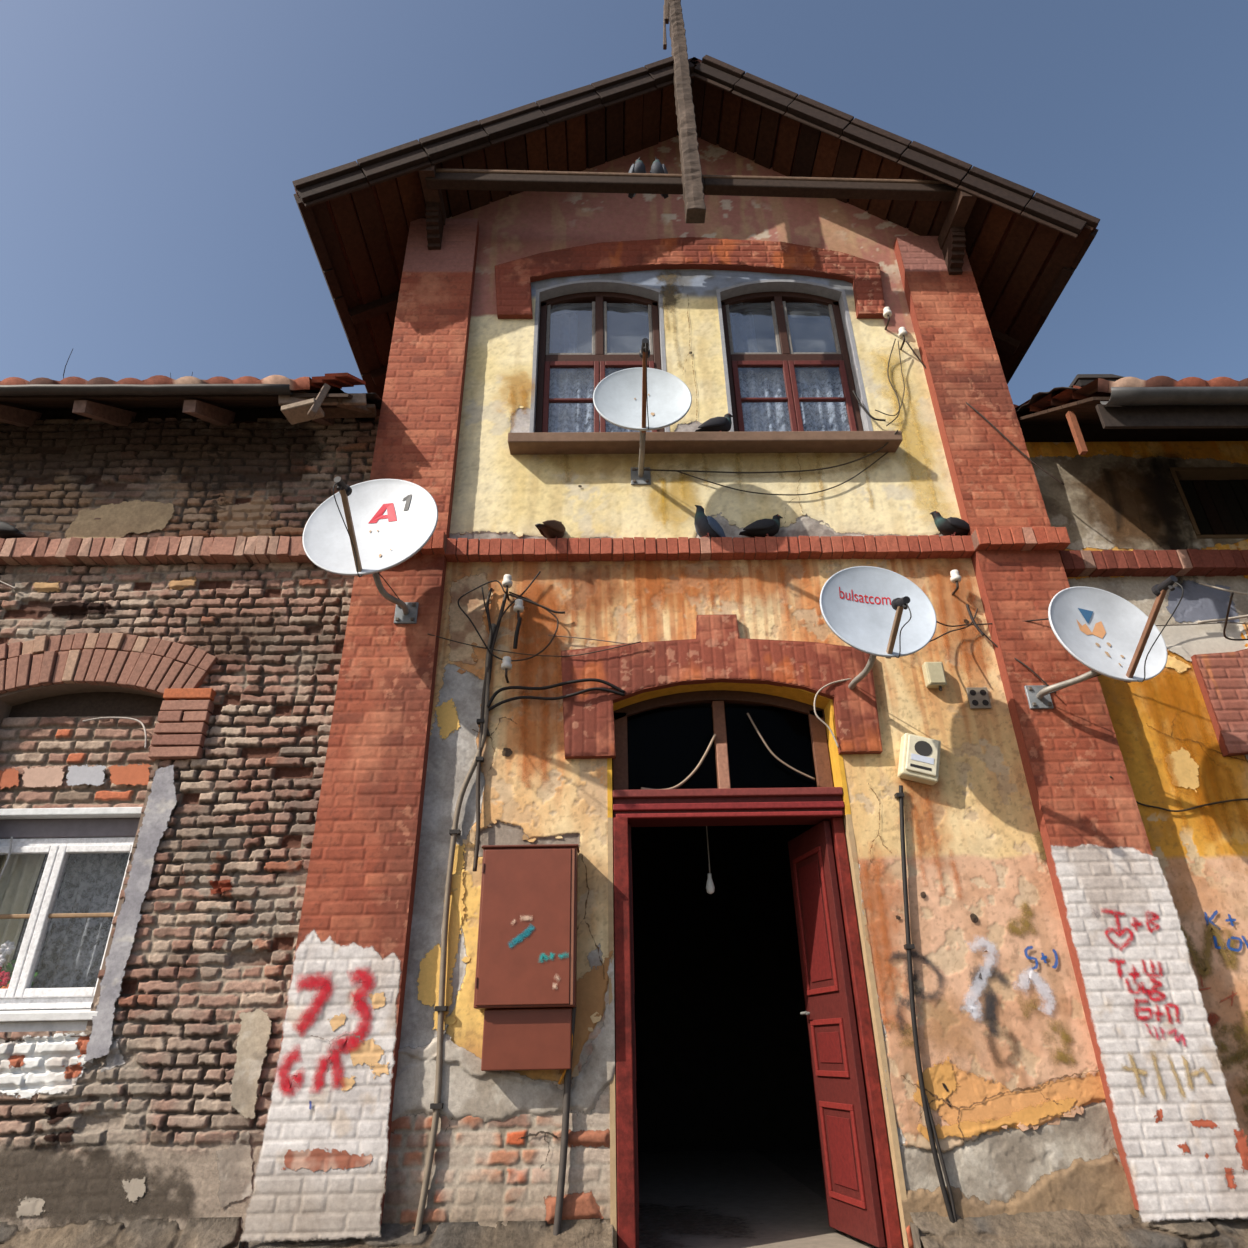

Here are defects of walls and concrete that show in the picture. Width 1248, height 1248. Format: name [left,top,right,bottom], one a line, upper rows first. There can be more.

crack [683,295,697,421]
flaking render [449,531,548,541]
flaking render [711,512,752,539]
flaking render [773,511,945,538]
water stain [1142,456,1187,550]
spalling [33,581,115,616]
peeling [168,576,196,590]
peeling [1164,747,1200,793]
spalling [208,880,233,895]
flaking render [382,572,615,1234]
peeling [0,1032,93,1143]
flaking render [896,1056,1139,1248]